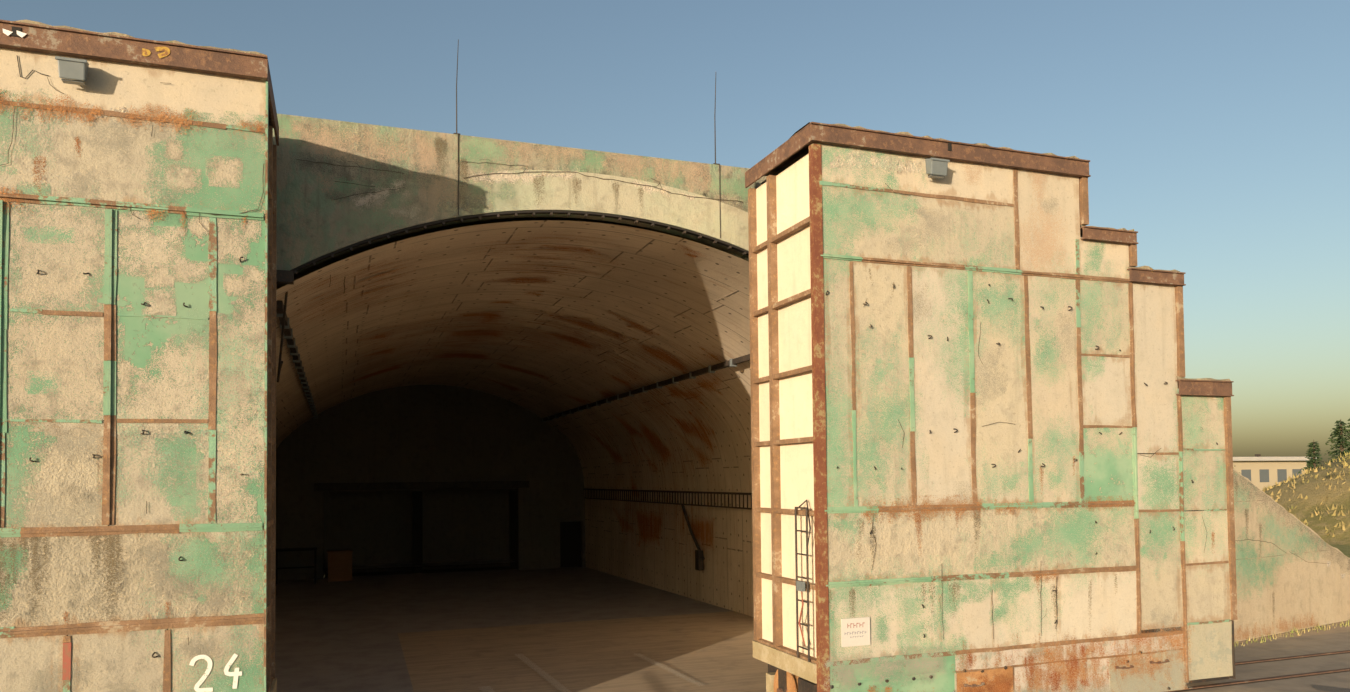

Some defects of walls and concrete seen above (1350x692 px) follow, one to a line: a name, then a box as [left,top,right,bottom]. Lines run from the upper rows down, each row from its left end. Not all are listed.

corrosion [0,90,203,157]
crack [462,159,742,202]
peeling [0,88,753,692]
corrosion [541,312,725,396]
peeling [821,144,1263,692]
corrosion [951,621,1195,692]